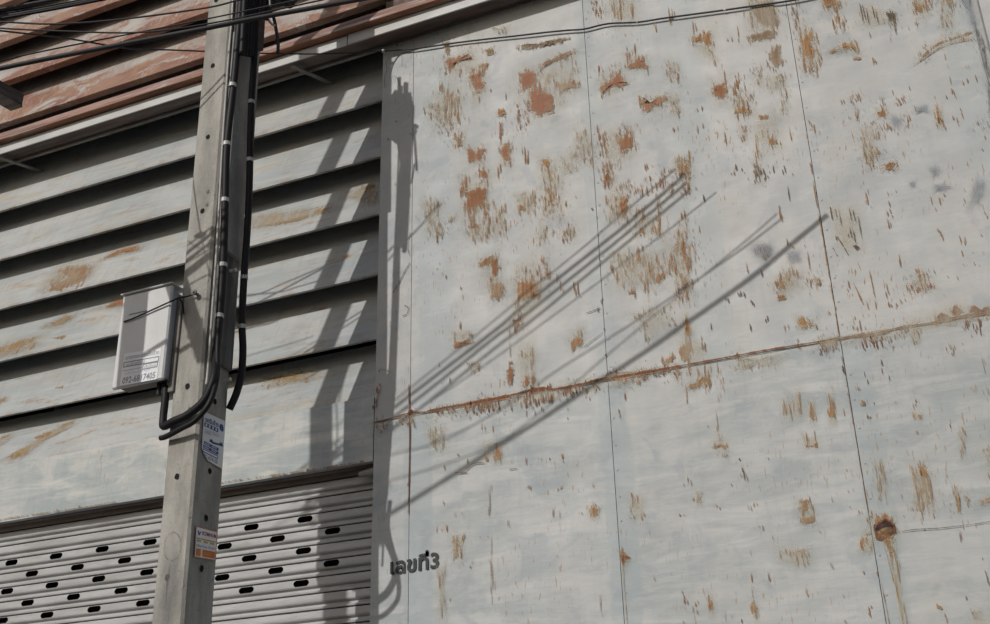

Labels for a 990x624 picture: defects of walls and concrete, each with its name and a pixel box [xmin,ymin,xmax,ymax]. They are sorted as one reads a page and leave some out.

corrosion [515,36,570,50]
corrosion [423,79,471,147]
corrosion [372,123,990,514]
corrosion [782,372,990,624]
corrosion [620,546,630,621]